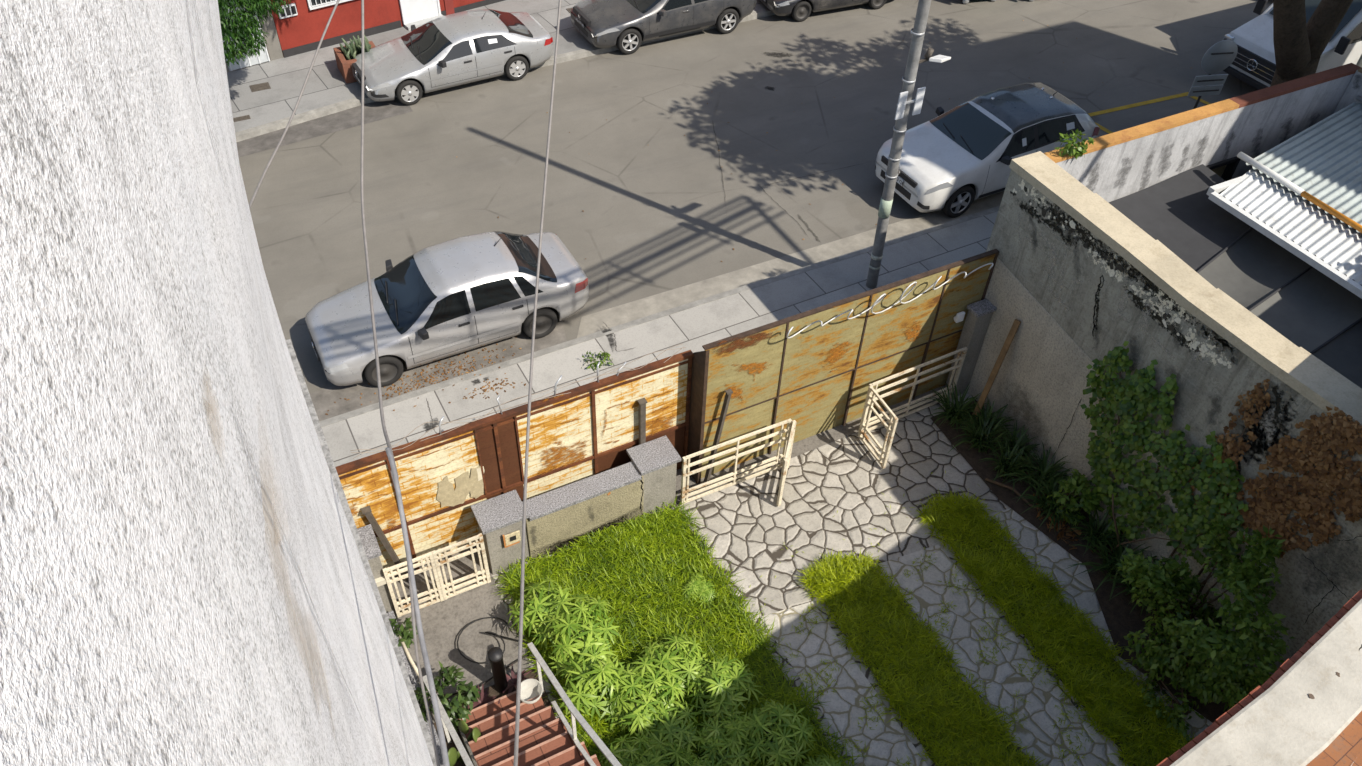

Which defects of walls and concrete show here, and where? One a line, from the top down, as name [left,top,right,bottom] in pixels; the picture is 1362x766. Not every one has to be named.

peeling [1010,177,1235,369]
rust [715,332,773,401]
rust [824,341,851,372]
rust [648,390,676,435]
rust [538,418,587,473]